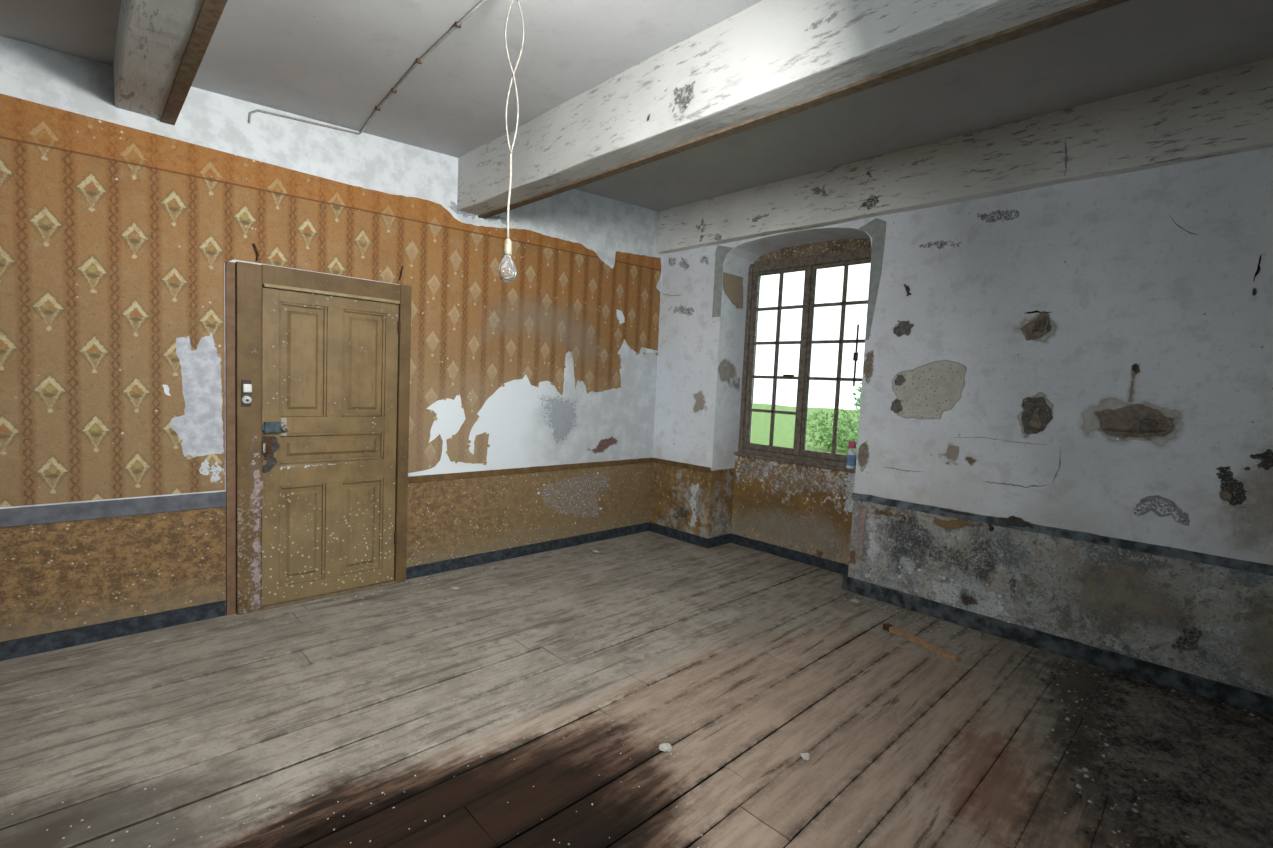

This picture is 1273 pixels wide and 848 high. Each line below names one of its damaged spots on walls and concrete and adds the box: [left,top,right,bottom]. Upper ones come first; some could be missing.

flaking render [1020,312,1056,342]
flaking render [891,360,966,419]
flaking render [1018,393,1053,436]
flaking render [1082,399,1181,445]
peeling [1244,449,1273,471]
water stain [673,484,699,526]
water stain [864,513,998,583]